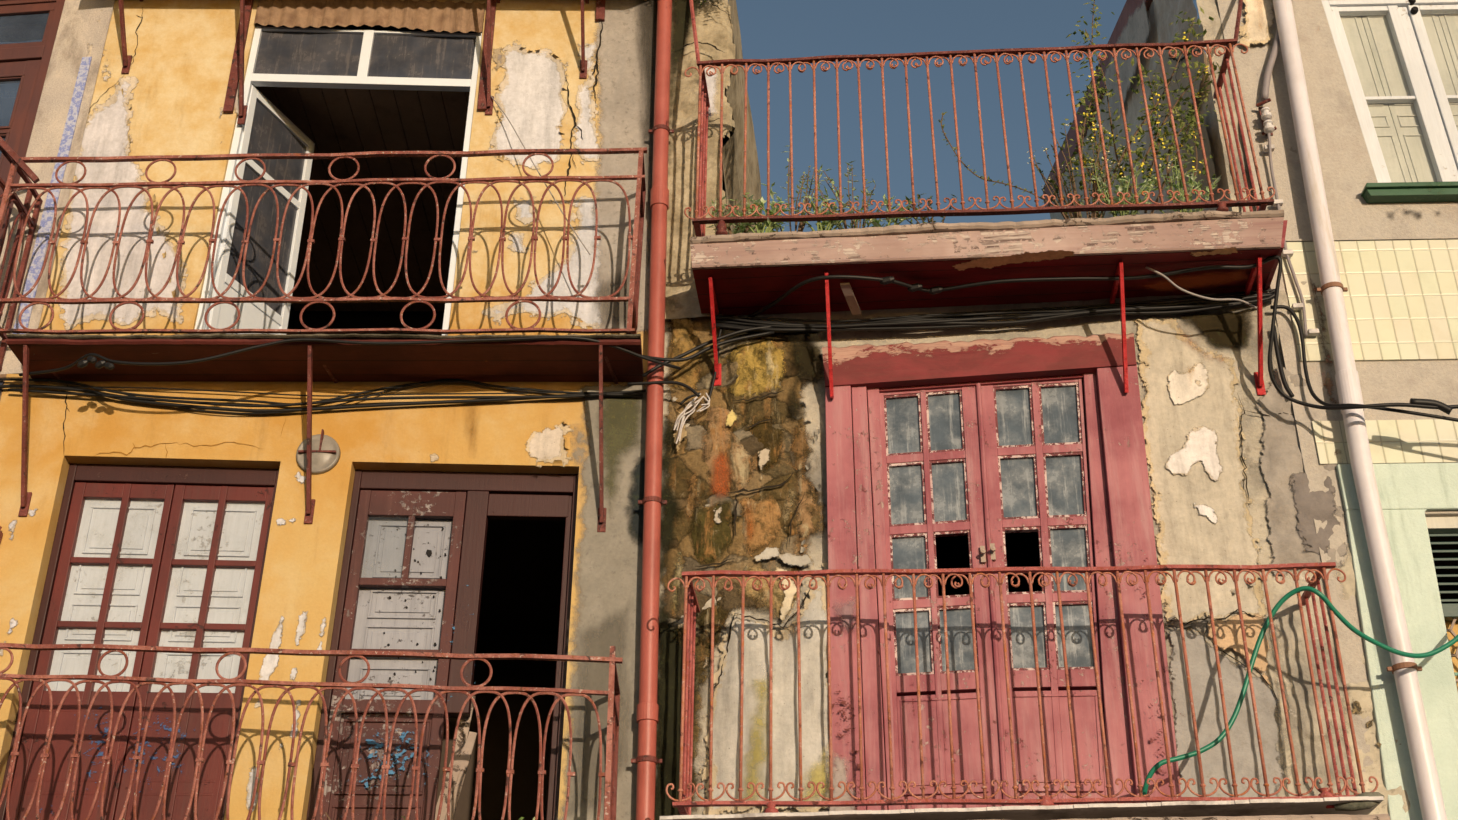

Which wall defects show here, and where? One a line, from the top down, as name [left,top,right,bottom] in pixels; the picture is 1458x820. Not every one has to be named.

peeling [58,43,188,330]
peeling [481,196,608,329]
peeling [489,40,602,170]
peeling [953,250,1075,271]
crack [63,385,286,456]
damp [603,397,680,576]
spalling [658,315,826,810]
damp [784,332,821,417]
spalling [1230,283,1348,593]
damp [578,617,623,806]
damp [655,598,697,820]
spalling [1150,613,1284,797]